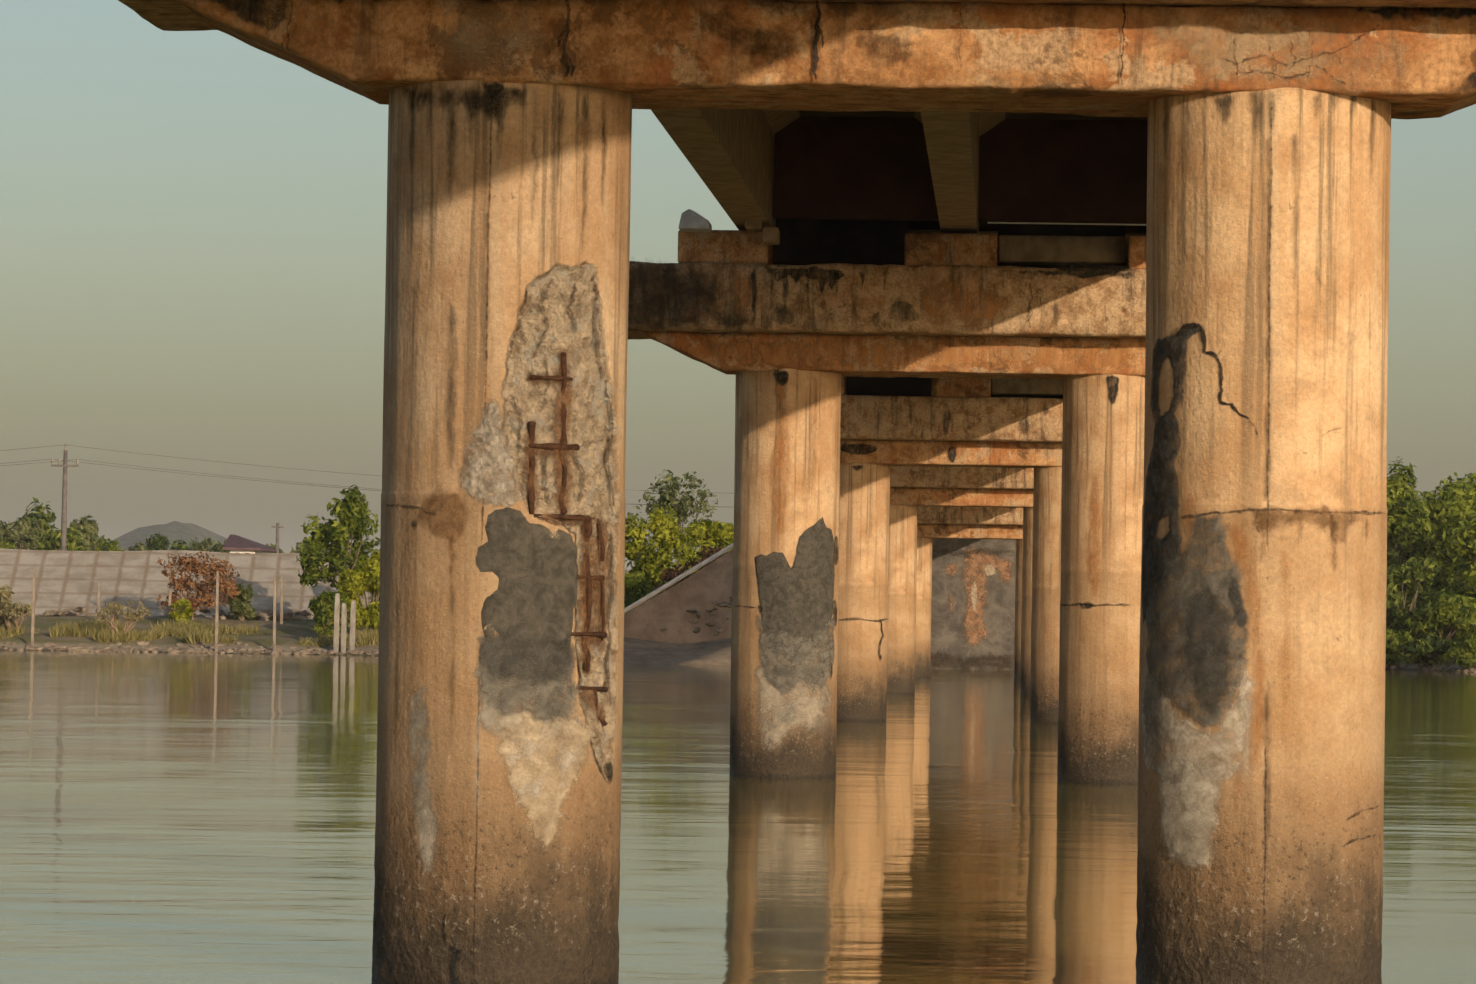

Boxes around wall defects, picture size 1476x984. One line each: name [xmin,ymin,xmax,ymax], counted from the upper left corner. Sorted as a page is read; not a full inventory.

water stain [1359,6,1476,19]
water stain [405,86,525,146]
water stain [1219,95,1232,117]
crack [1177,323,1258,435]
spalling [460,263,620,846]
corrosion [524,350,609,720]
crack [1181,508,1381,535]
corrosion [946,550,1012,645]
crack [1062,601,1126,609]
crack [839,618,887,660]
peeling [756,600,837,748]